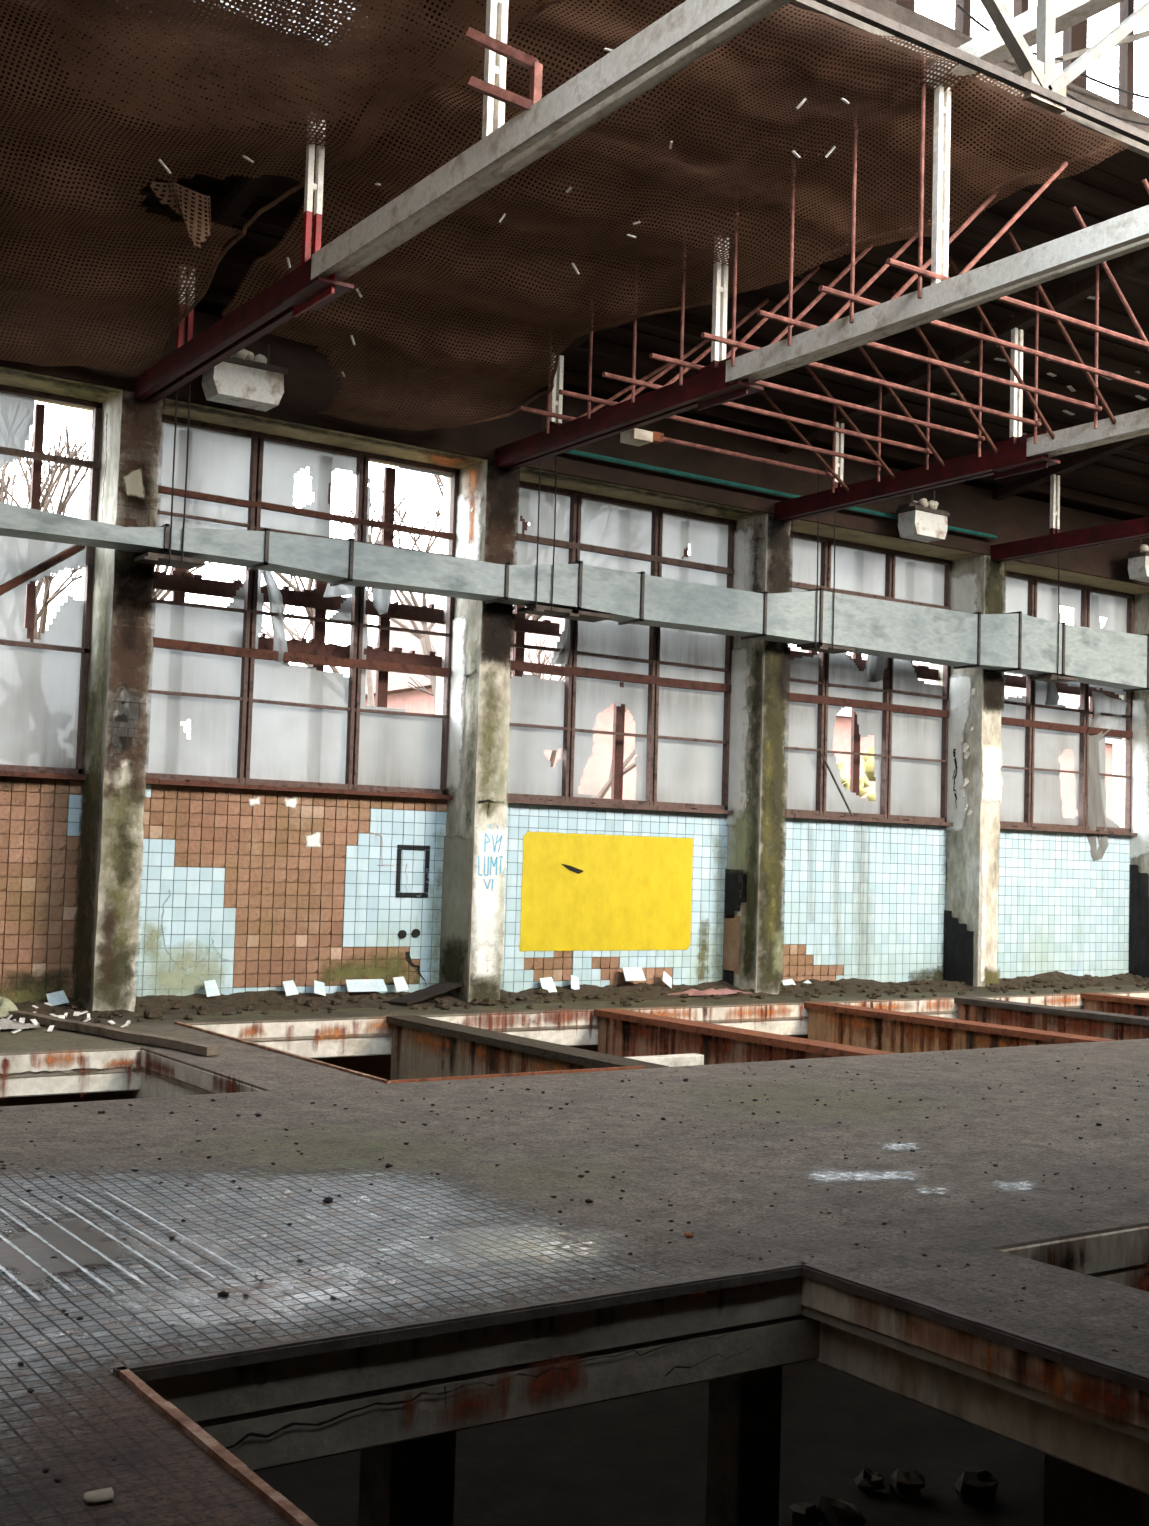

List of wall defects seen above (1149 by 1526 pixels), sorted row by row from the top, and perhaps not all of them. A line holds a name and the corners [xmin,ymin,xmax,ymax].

water stain [0,369,467,527]
peeling [455,490,481,561]
water stain [484,460,794,594]
water stain [0,550,158,1010]
peeling [143,617,466,987]
water stain [439,601,516,1002]
peeling [1128,699,1149,979]
corrosion [31,1053,86,1076]
corrosion [108,1052,175,1084]
corrosion [315,1008,807,1075]
corrosion [827,994,1149,1058]
crack [225,1327,752,1449]